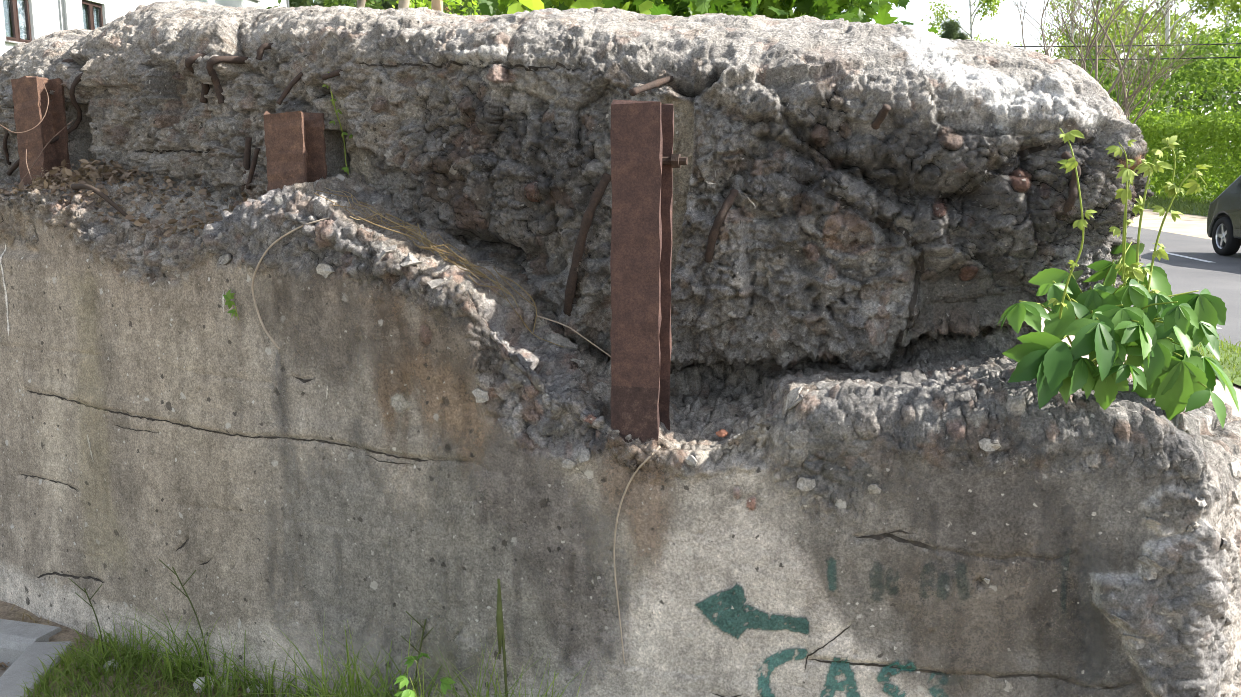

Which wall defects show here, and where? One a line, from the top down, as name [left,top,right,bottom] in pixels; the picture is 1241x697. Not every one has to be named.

spalling [312,84,334,98]
spalling [669,72,721,98]
spalling [0,195,38,248]
leakage [258,256,495,398]
spalling [201,184,613,469]
crack [29,391,485,468]
leakage [272,349,288,432]
leakage [391,394,410,411]
leakage [266,429,627,697]
crack [856,530,966,556]
crack [805,625,1132,691]